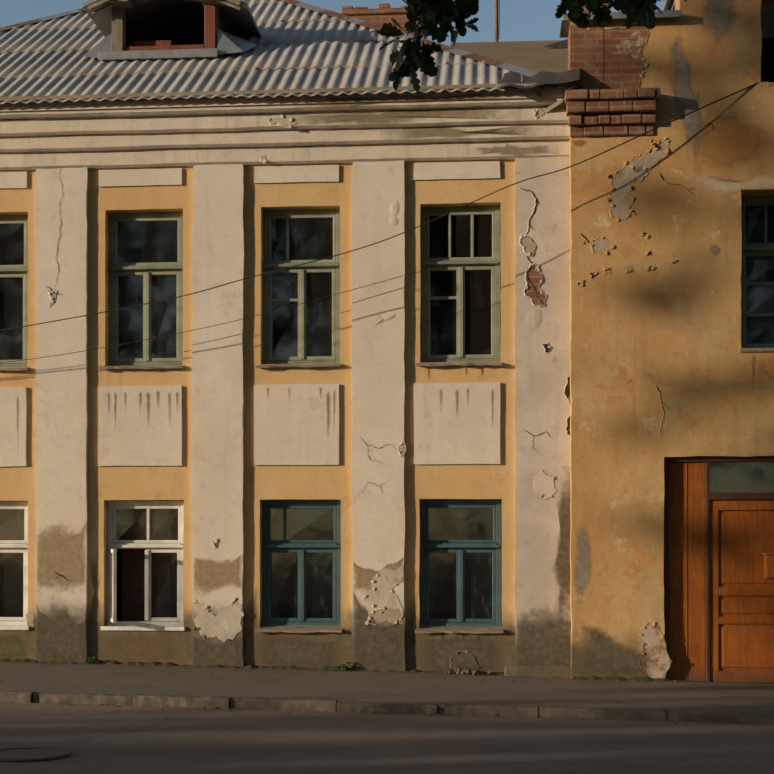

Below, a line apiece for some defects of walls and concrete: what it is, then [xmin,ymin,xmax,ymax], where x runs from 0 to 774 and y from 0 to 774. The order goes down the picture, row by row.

water stain [671,42,760,166]
crack [520,188,540,234]
flaking render [606,137,670,221]
water stain [705,177,774,193]
flaking render [518,235,548,308]
crack [526,254,542,303]
crack [656,386,669,435]
water stain [36,609,85,660]
water stain [37,527,99,613]
peeling [192,597,244,642]
peeling [363,567,404,625]
flaking render [638,621,672,680]